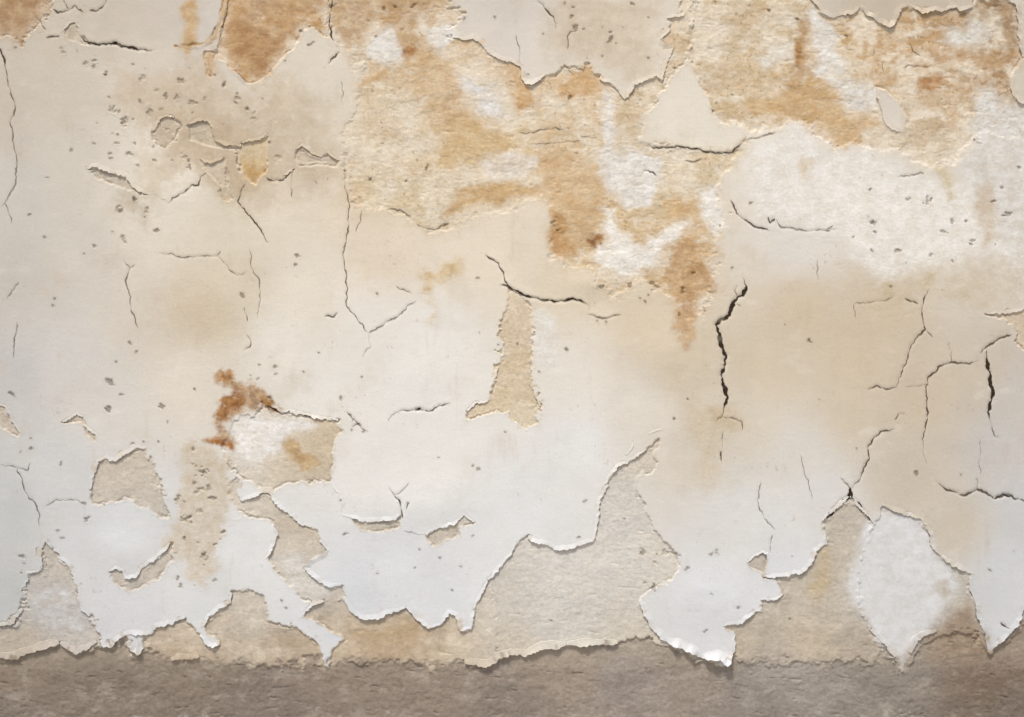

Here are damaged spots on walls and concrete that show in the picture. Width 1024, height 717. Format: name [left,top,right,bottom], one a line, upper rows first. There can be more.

rust [210,365,285,453]
water stain [360,22,404,72]
peeling [280,12,540,238]
peeling [465,285,545,434]
crack [486,255,621,319]
water stain [532,0,689,286]
peeling [367,0,1024,242]
crack [715,280,748,461]
water stain [803,4,882,111]
water stain [737,78,1024,321]
crack [801,288,1024,524]
peeling [0,390,1024,717]